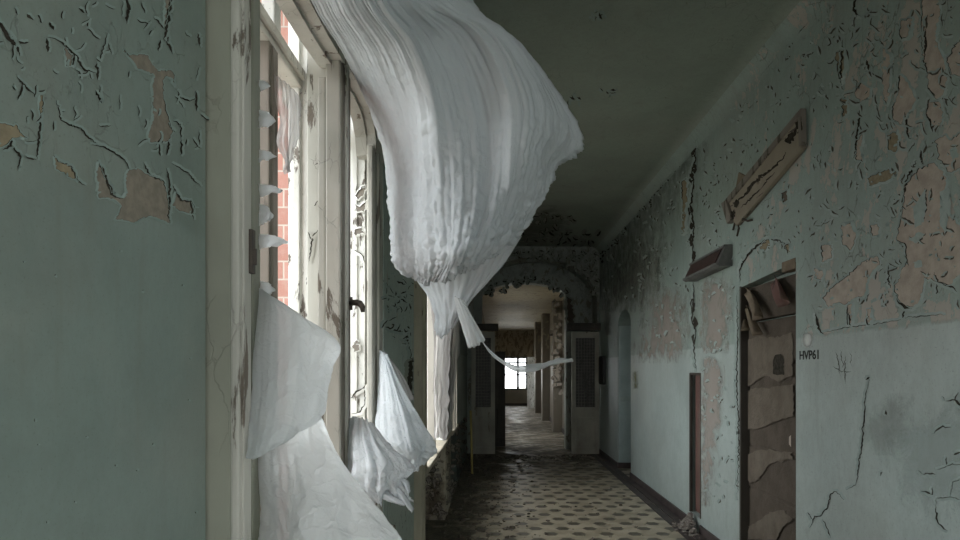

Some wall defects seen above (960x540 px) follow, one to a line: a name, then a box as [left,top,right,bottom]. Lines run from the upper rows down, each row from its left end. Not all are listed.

peeling [801,0,960,328]
peeling [484,271,577,399]
crack [688,148,698,372]
crack [806,375,887,539]
crack [917,449,960,533]
crack [932,391,960,434]